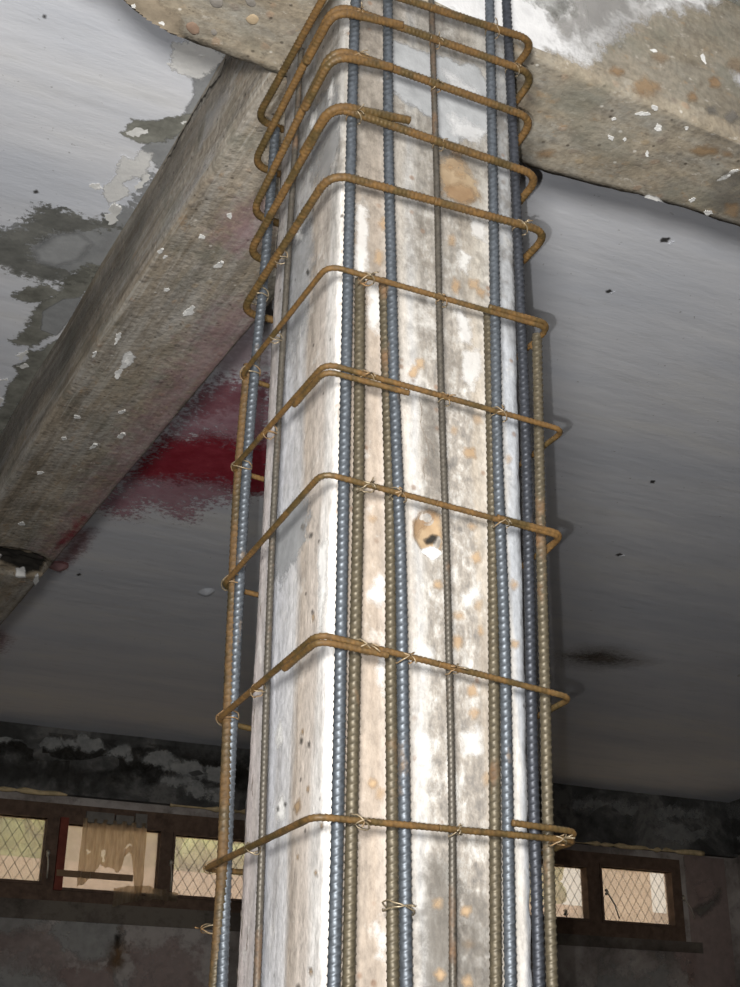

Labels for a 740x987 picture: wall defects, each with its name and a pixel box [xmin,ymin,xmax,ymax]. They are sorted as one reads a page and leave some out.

peeling [126,127,148,137]
peeling [89,150,153,225]
spalling [413,512,442,560]
spalling [0,547,51,586]
leakage [0,736,221,782]
leakage [235,763,250,790]